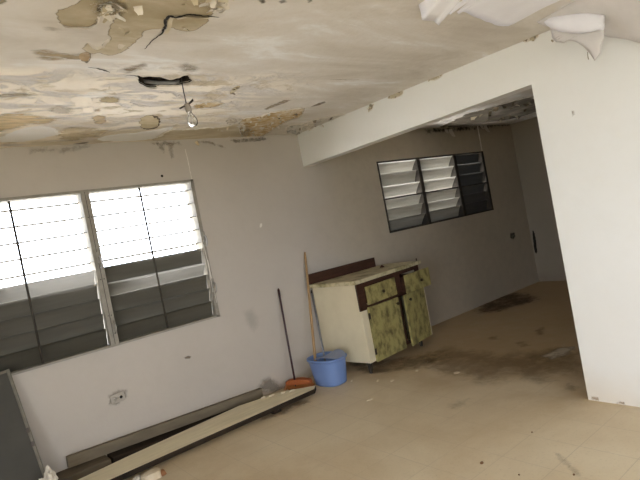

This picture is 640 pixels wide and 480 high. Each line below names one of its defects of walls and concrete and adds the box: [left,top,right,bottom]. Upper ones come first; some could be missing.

peeling [56,0,234,55]
crack [145,14,214,49]
spalling [136,74,194,89]
flaking render [0,127,57,142]
peeling [139,107,344,146]
peeling [440,96,536,137]
water stain [484,293,530,312]